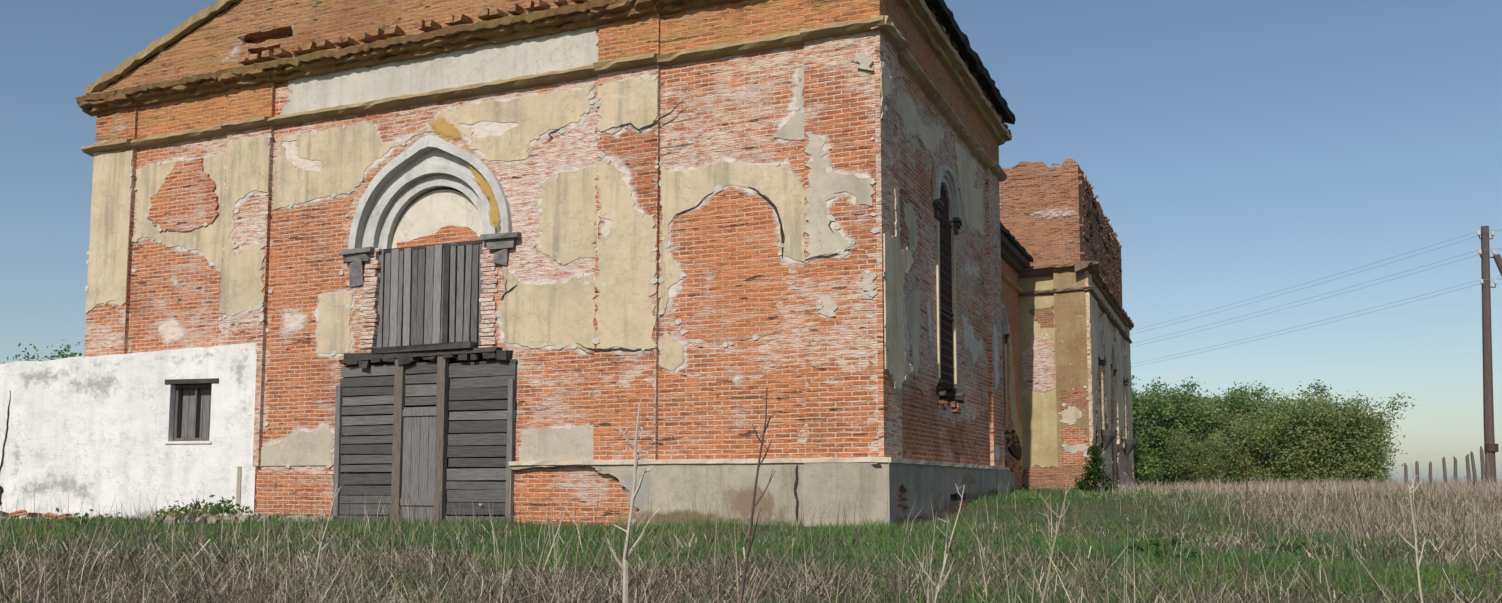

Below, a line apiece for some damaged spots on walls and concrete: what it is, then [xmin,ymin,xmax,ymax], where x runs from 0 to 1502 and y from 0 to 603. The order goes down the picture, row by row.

peeling [128,179,363,442]
peeling [488,93,1130,526]
spalling [254,449,334,519]